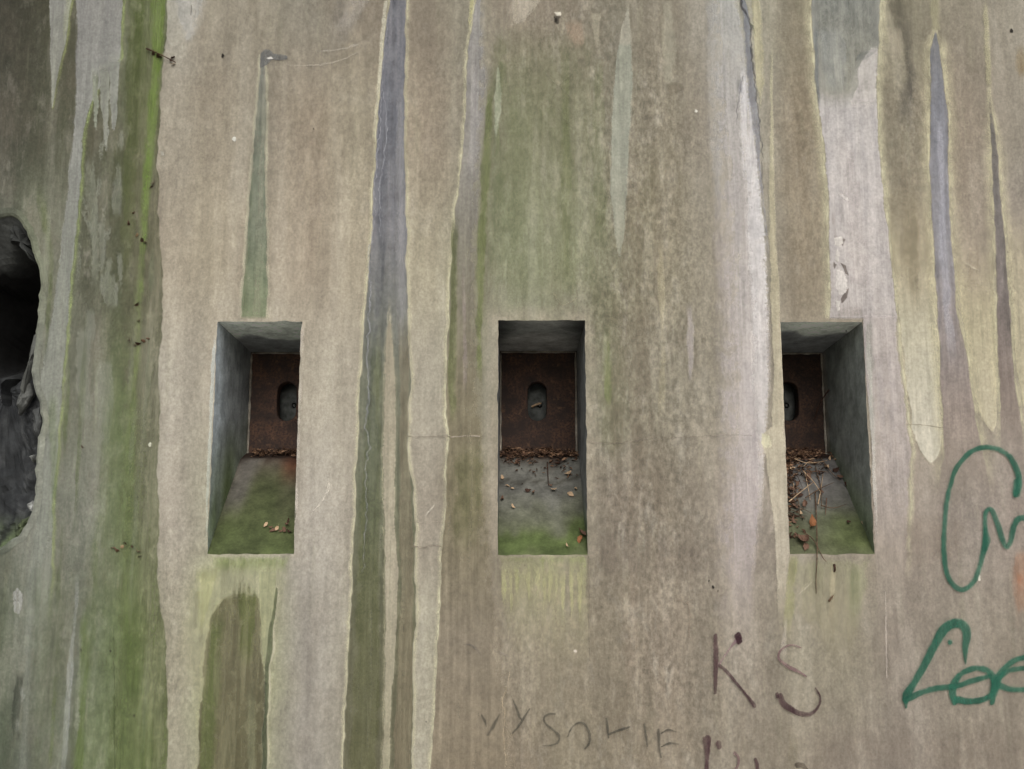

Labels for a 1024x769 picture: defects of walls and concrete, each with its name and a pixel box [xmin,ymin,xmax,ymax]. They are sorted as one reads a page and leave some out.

peeling [10,225,38,265]
peeling [16,500,34,537]
peeling [17,334,43,439]
leakage [30,0,123,576]
leakage [241,49,287,316]
leakage [341,0,418,769]
leakage [927,30,982,451]
leakage [990,112,1020,422]
leakage [197,572,278,769]